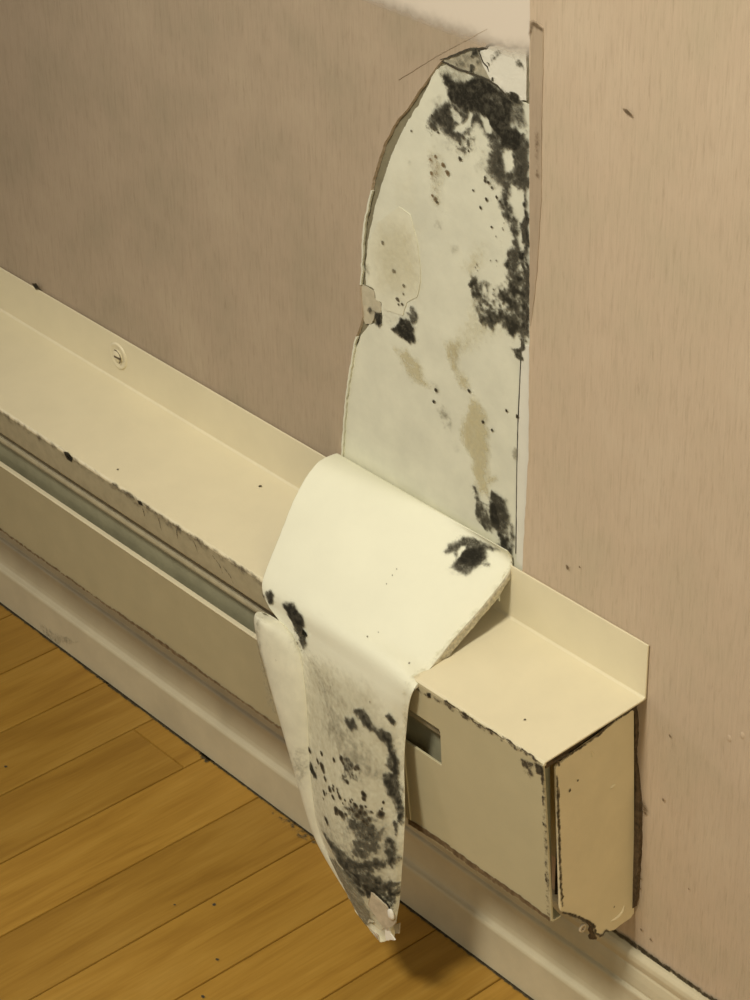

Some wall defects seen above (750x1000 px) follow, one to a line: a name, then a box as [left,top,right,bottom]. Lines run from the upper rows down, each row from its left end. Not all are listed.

mould [426,47,530,361]
water stain [368,284,437,403]
water stain [444,378,514,574]